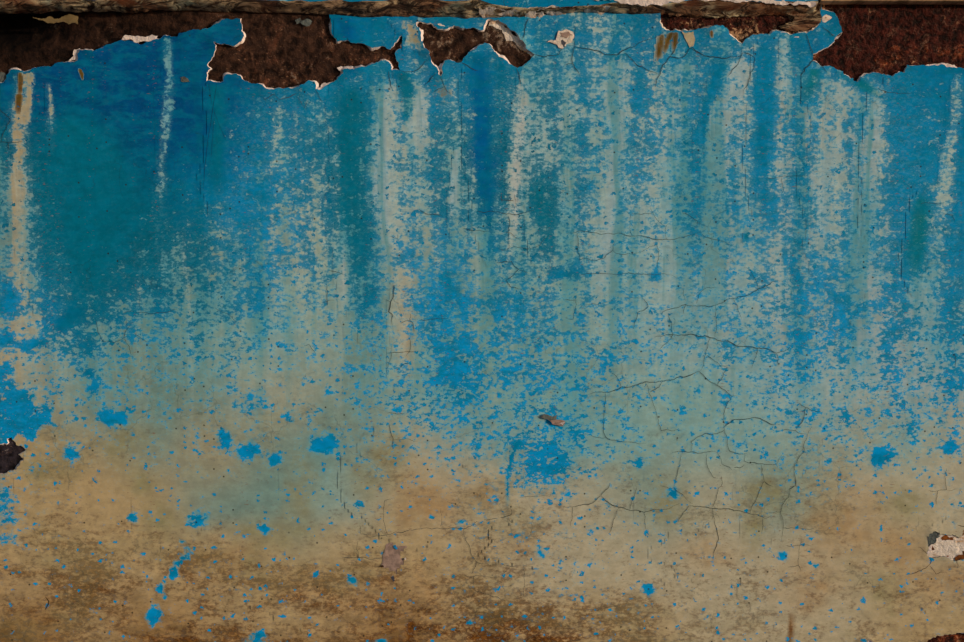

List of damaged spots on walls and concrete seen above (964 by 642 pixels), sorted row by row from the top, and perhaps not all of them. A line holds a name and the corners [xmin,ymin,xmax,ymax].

peeling [0,0,402,90]
peeling [416,0,964,82]
peeling [0,437,26,474]
water stain [0,36,182,340]
crack [384,287,447,368]
crack [344,495,544,599]
water stain [319,51,572,398]
water stain [582,57,638,353]
crack [566,208,820,570]
water stain [692,36,890,287]
water stain [899,72,964,297]
peeling [927,633,964,642]